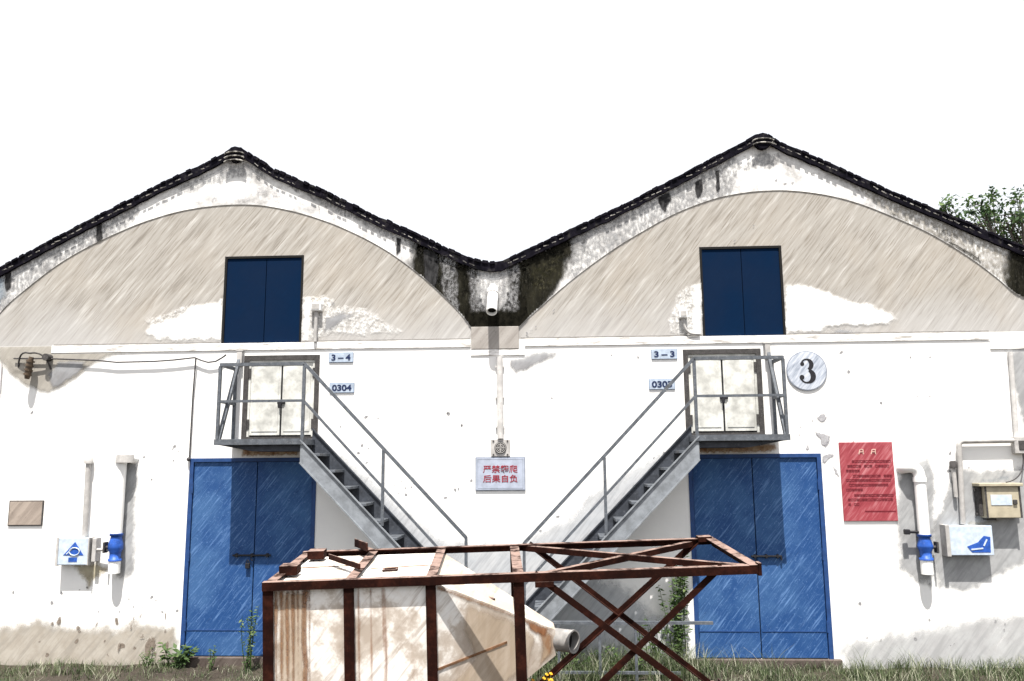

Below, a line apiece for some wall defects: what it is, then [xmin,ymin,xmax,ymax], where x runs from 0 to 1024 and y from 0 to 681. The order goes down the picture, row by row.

damp [289,152,794,327]
peeling [146,299,223,340]
peeling [302,297,398,341]
peeling [669,284,702,333]
peeling [785,285,894,333]
damp [0,346,113,392]
damp [510,352,556,372]